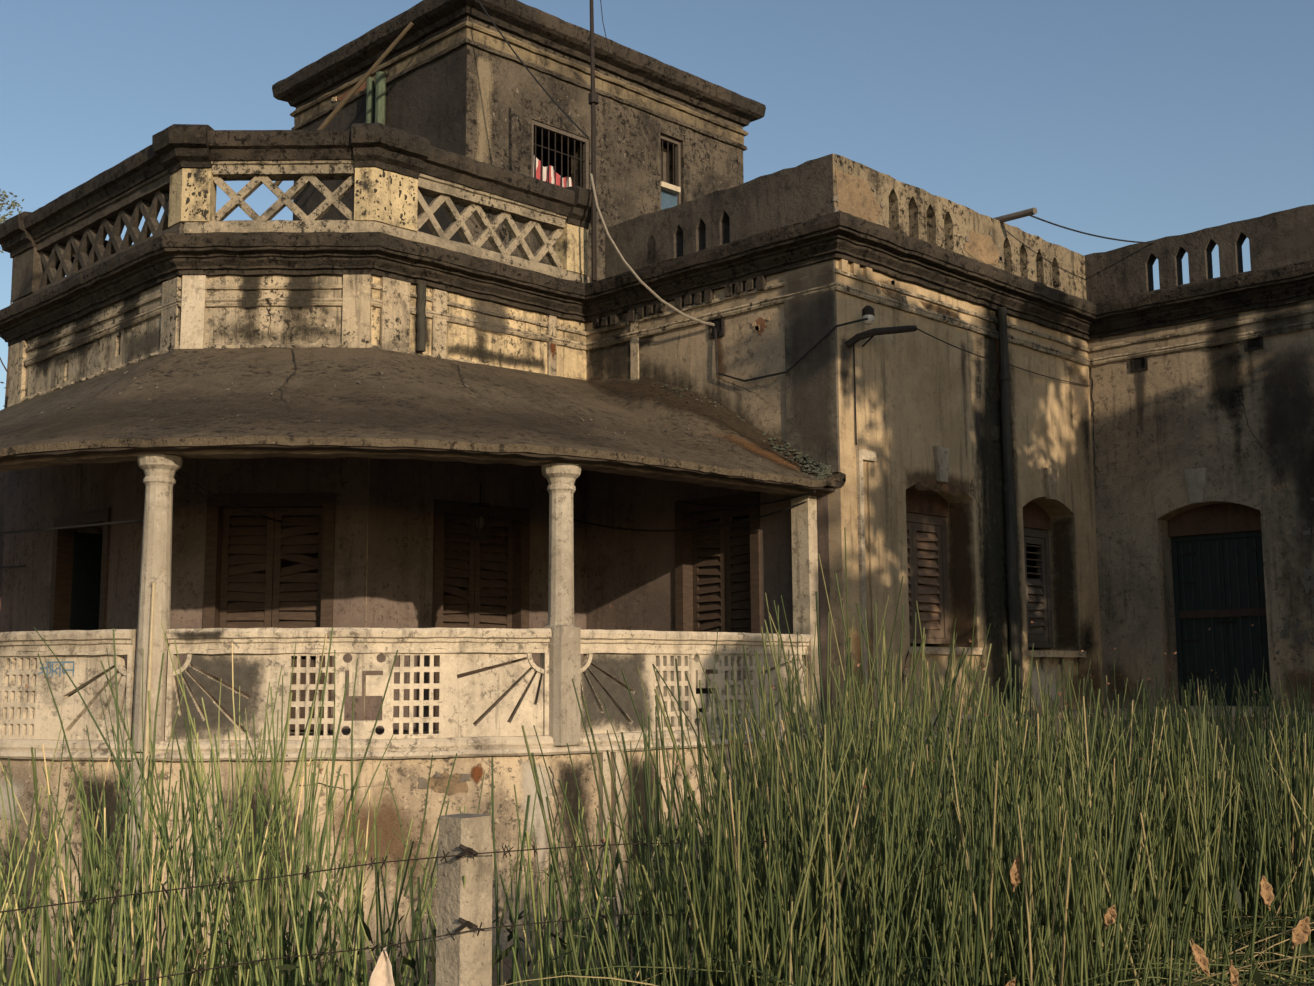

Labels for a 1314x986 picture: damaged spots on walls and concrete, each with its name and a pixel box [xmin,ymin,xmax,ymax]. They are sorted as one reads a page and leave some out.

damp [222,276,261,340]
damp [284,276,324,340]
damp [1207,303,1314,516]
damp [171,631,262,739]
flaking render [418,771,470,795]